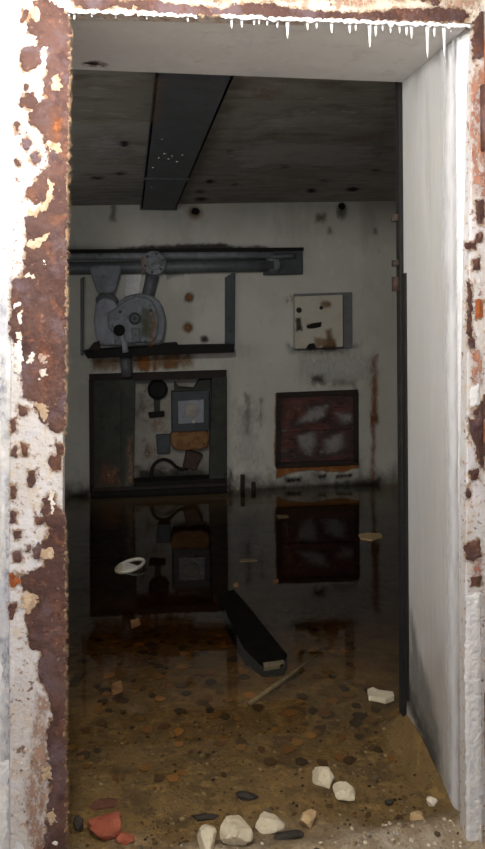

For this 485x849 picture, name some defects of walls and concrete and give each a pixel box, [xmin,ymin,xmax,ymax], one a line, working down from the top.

damp [67,8,197,19]
efflorescence [0,74,14,249]
corrosion [8,0,485,473]
corrosion [8,482,17,500]
corrosion [27,468,37,488]
corrosion [276,465,359,478]
damp [221,14,471,811]
corrosion [464,400,485,500]
corrosion [463,537,483,588]
corrosion [7,489,69,849]
efflorescence [0,760,9,841]